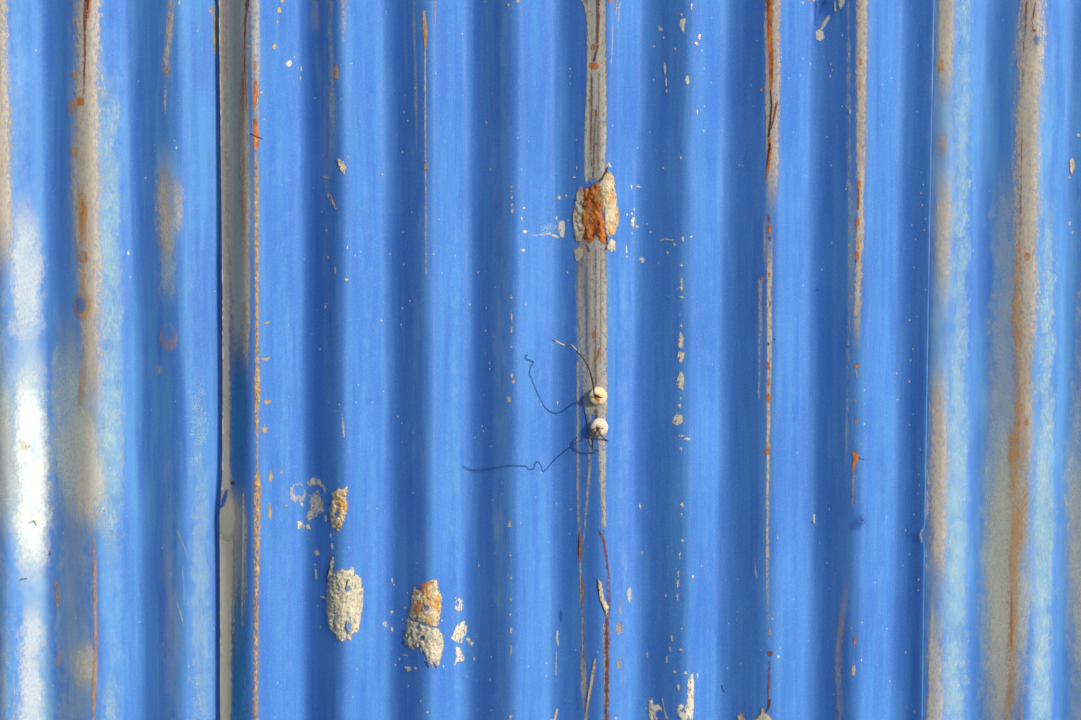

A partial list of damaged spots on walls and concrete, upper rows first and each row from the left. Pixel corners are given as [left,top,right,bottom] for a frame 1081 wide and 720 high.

rust [572,162,619,262]
rust [241,61,262,720]
peeling [290,477,327,530]
peeling [551,561,599,720]
peeling [737,700,772,720]